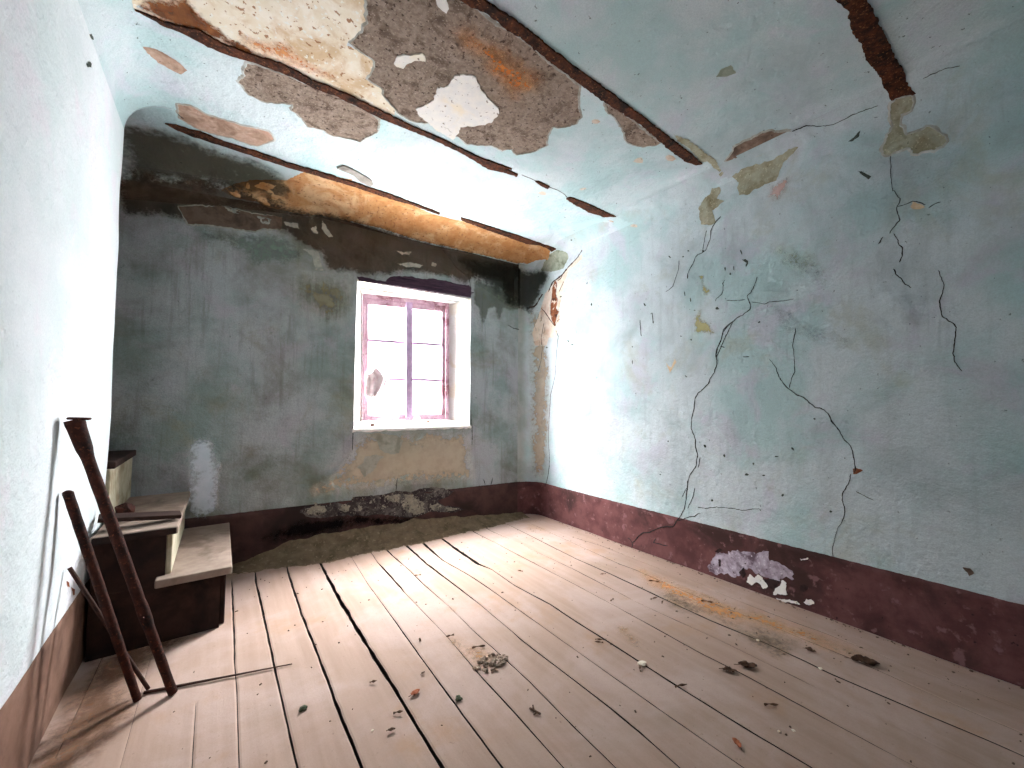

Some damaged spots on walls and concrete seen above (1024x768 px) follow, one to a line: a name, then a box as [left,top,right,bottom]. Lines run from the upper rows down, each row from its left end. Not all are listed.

spalling [132,0,661,163]
spalling [879,95,949,157]
leakage [120,127,548,321]
peeling [675,129,798,225]
crack [878,156,940,288]
crack [938,270,962,371]
spalling [300,433,463,518]
leakage [324,435,469,488]
crack [628,278,792,548]
crack [769,328,856,555]
spalling [763,579,780,589]